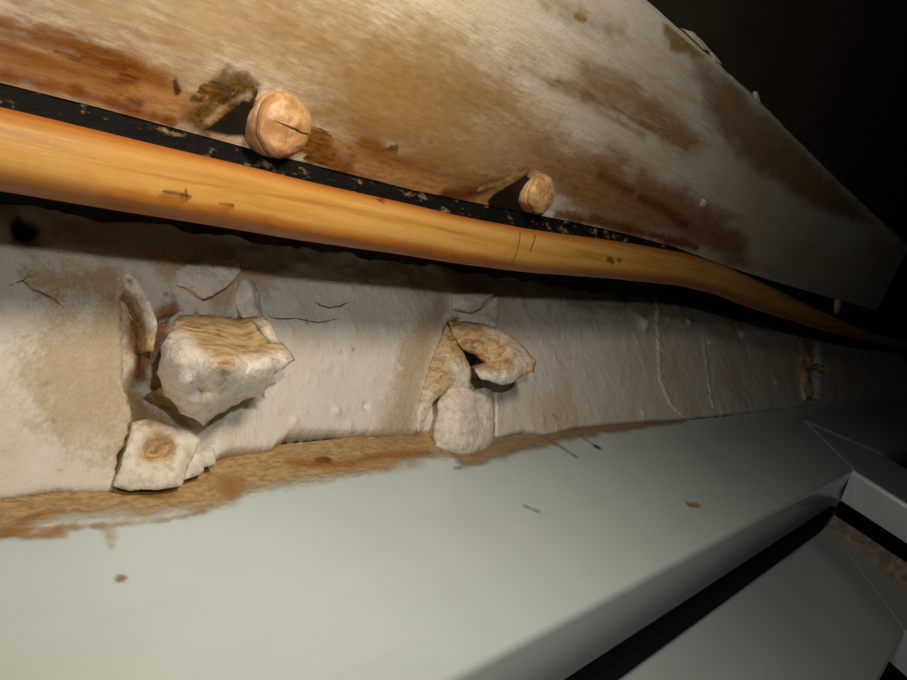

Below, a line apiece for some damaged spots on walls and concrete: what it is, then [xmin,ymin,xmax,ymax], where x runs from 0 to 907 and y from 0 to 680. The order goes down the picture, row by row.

water stain [665,23,703,56]
water stain [50,0,552,184]
spalling [206,94,255,135]
water stain [701,71,865,220]
water stain [110,189,248,218]
water stain [305,228,513,269]